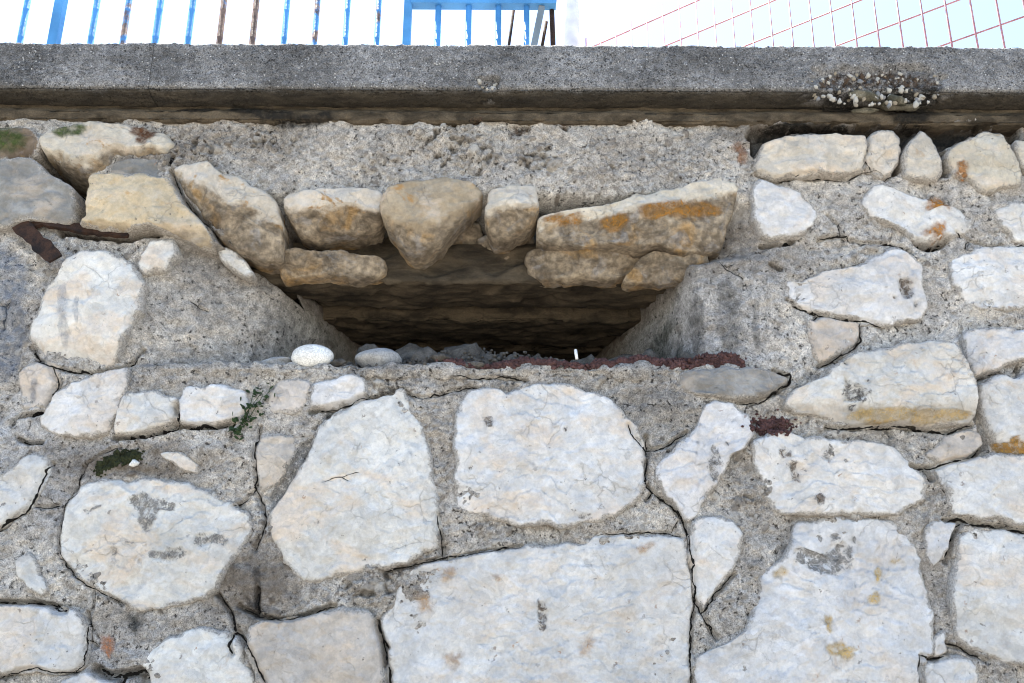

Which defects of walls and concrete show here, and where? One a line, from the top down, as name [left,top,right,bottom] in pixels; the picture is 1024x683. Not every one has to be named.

spalling [811,71,939,113]
crack [0,412,267,683]
crack [597,425,731,683]